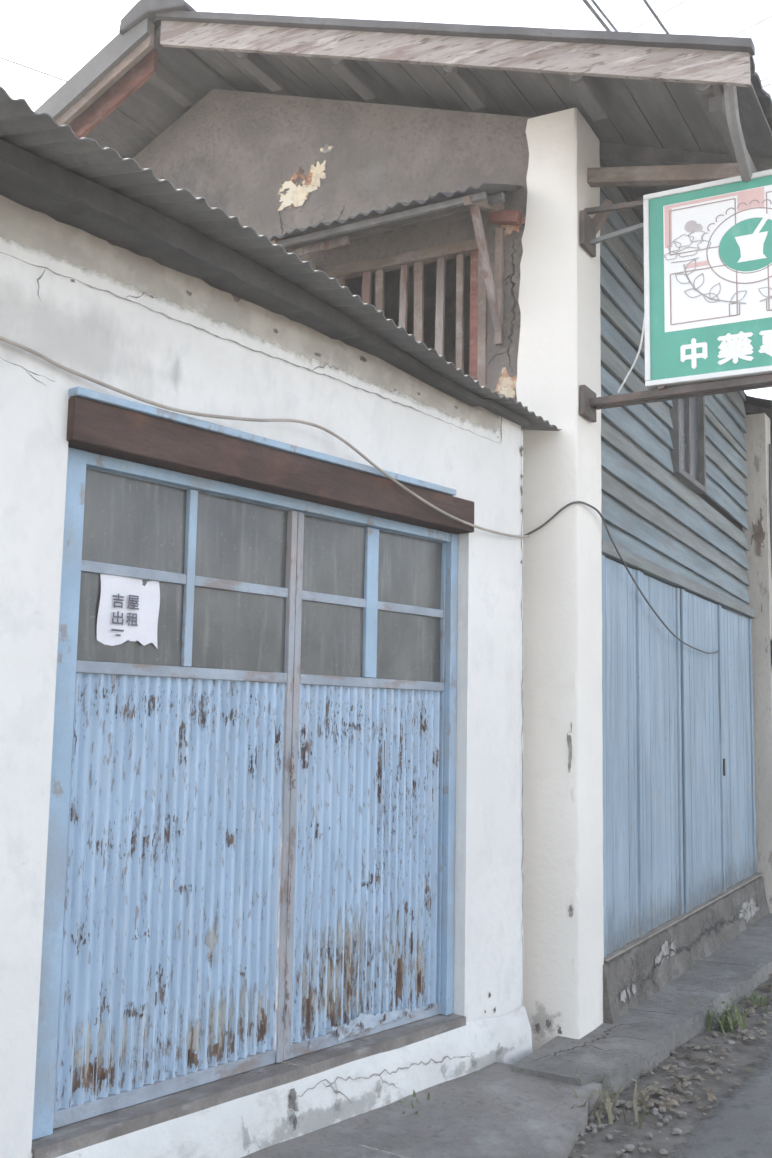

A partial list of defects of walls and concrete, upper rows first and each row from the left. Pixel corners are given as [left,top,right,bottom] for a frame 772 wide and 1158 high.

spalling [278,144,334,211]
flaking render [494,367,517,398]
spalling [737,896,761,923]
rust [256,930,354,1049]
rust [389,940,424,1010]
spalling [655,939,678,965]
rust [72,1022,110,1094]
rust [186,1003,229,1068]
crack [290,1052,474,1104]